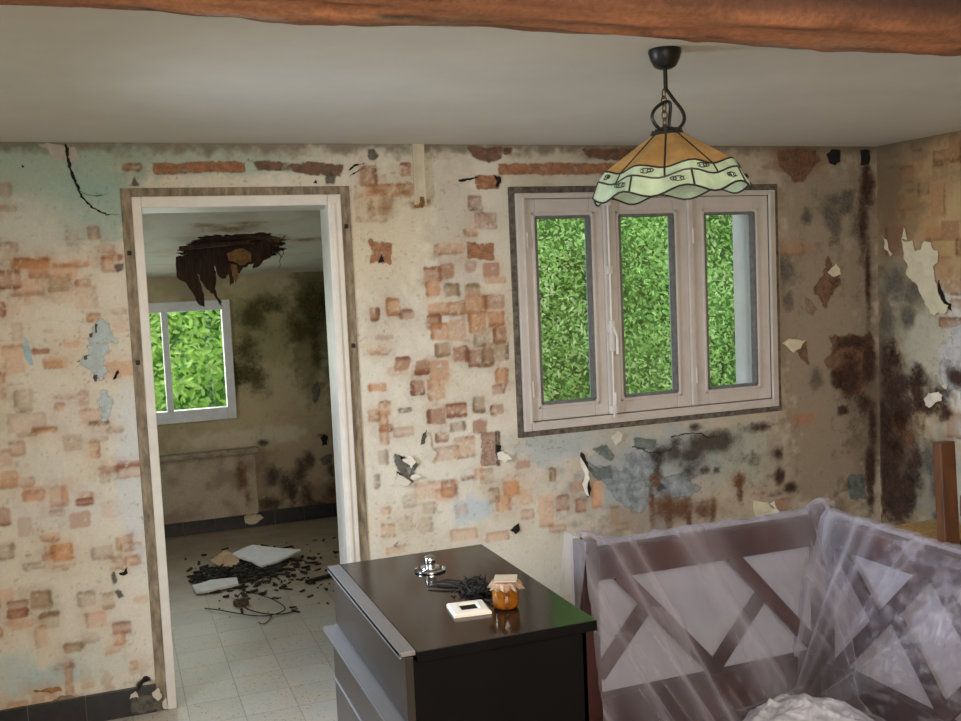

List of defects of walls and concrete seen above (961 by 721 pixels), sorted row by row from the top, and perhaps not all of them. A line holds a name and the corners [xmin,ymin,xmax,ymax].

crack [39,143,118,215]
spalling [176,232,286,307]
flaking render [368,239,392,265]
damp [822,165,875,309]
damp [884,271,920,327]
flaking render [881,229,952,316]
damp [233,297,280,389]
flaking render [924,324,961,408]
damp [260,452,336,509]
flaking render [394,430,437,487]
peeling [580,431,701,513]
damp [811,336,961,520]